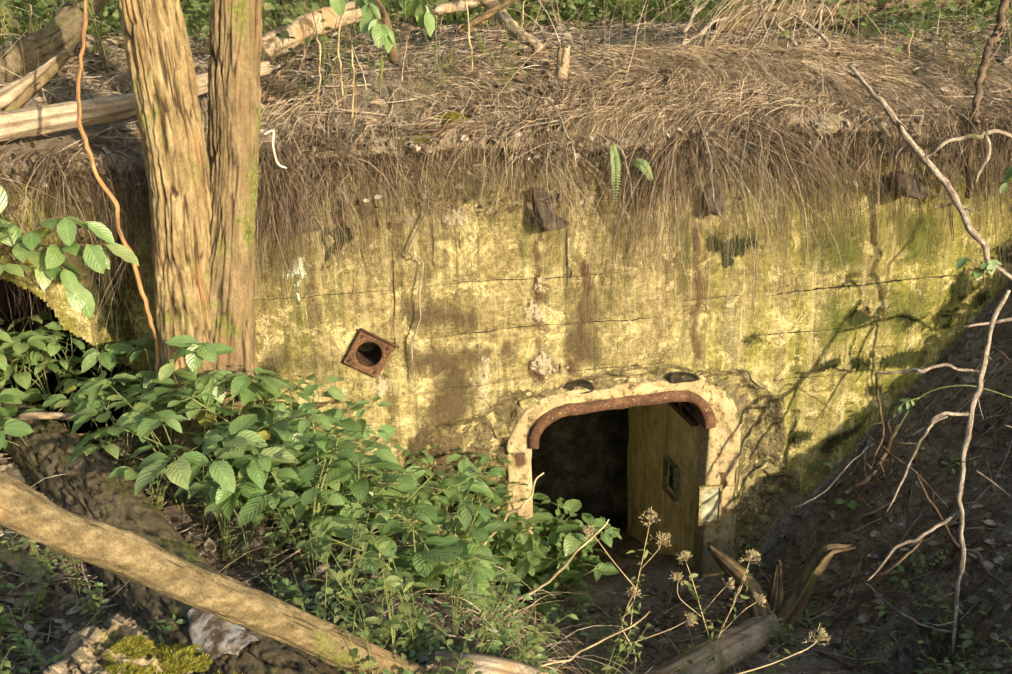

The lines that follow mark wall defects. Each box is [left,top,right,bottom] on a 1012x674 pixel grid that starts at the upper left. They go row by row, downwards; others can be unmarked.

crack [772,275,958,296]
leakage [525,302,542,321]
leakage [530,352,569,375]